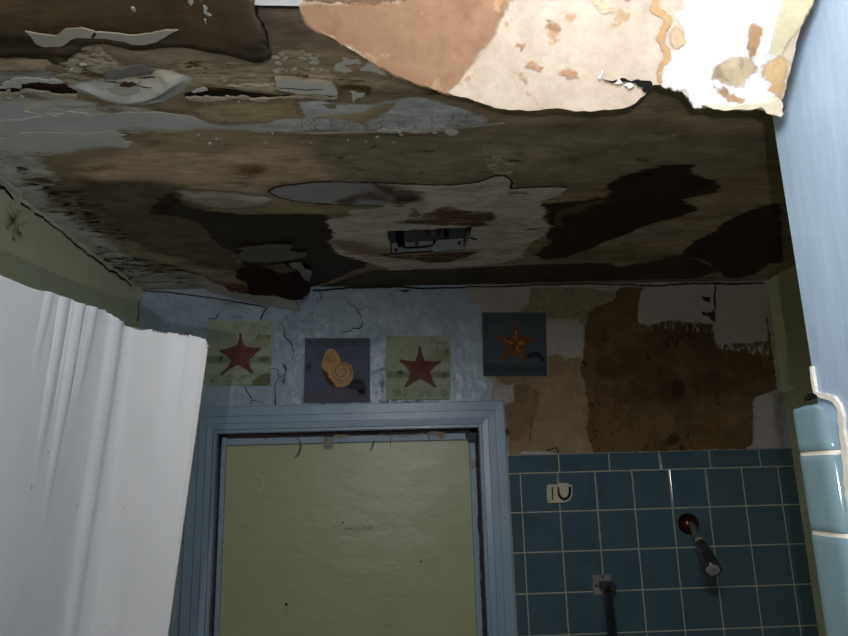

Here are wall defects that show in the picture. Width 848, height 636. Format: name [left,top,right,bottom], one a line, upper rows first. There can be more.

peeling [25,27,178,85]
damp [83,43,253,70]
damp [254,0,513,97]
damp [557,68,579,80]
damp [649,0,687,85]
peeling [662,0,783,112]
damp [710,0,814,104]
peeling [0,46,505,290]
peeling [226,262,313,300]
damp [9,99,785,455]
peeling [461,278,785,455]
crack [236,430,465,438]